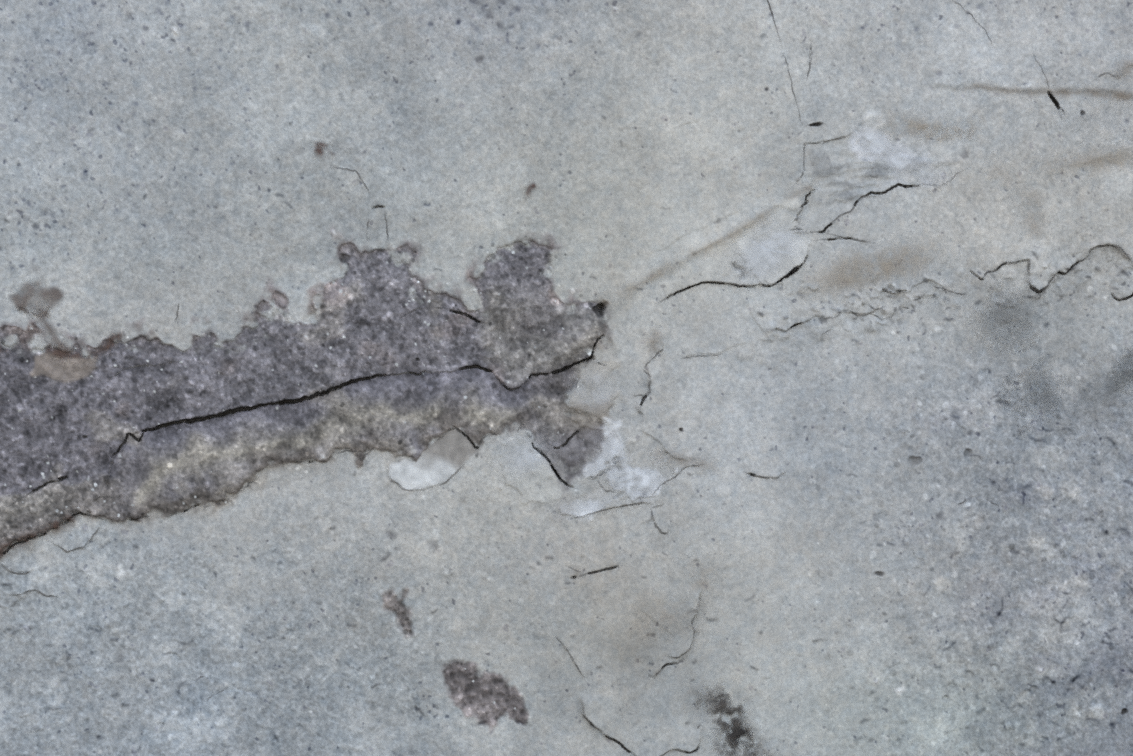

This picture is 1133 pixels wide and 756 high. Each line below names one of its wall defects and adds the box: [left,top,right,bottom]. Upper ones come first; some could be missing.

crack [1049,93,1064,114]
crack [796,173,913,242]
crack [674,264,802,295]
crack [852,260,1082,317]
crack [460,338,601,390]
crack [114,372,421,455]
spalling [0,240,683,557]
crack [518,429,578,485]
crack [3,496,107,597]
spalling [382,588,414,638]
spalling [443,661,529,730]
leakage [714,695,756,756]